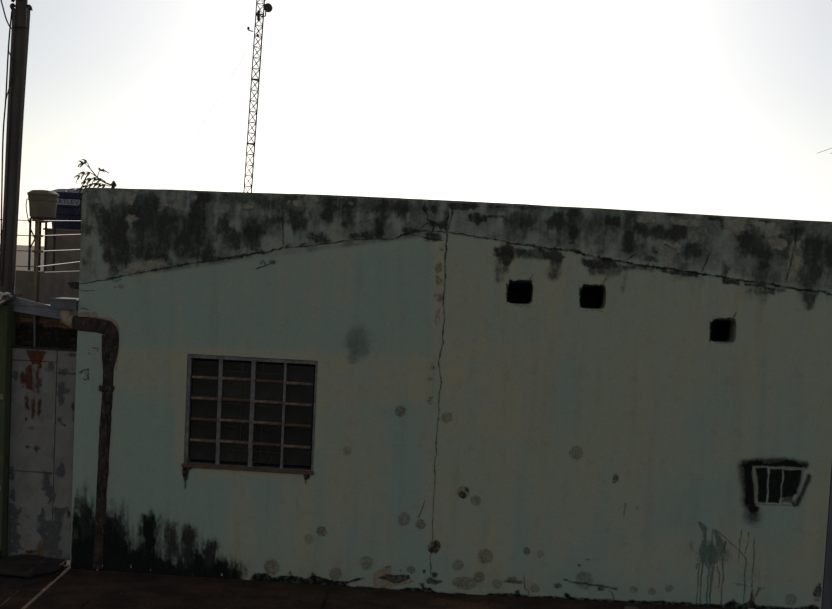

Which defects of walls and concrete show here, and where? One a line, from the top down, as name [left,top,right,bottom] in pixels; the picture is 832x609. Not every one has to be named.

damp [92,193,330,269]
damp [321,198,413,239]
damp [403,203,534,240]
damp [722,220,790,294]
damp [779,222,832,309]
crack [79,206,832,576]
peeling [37,463,68,557]
damp [71,499,241,579]
damp [251,570,444,593]
flaking render [373,566,414,588]
damp [487,522,821,609]